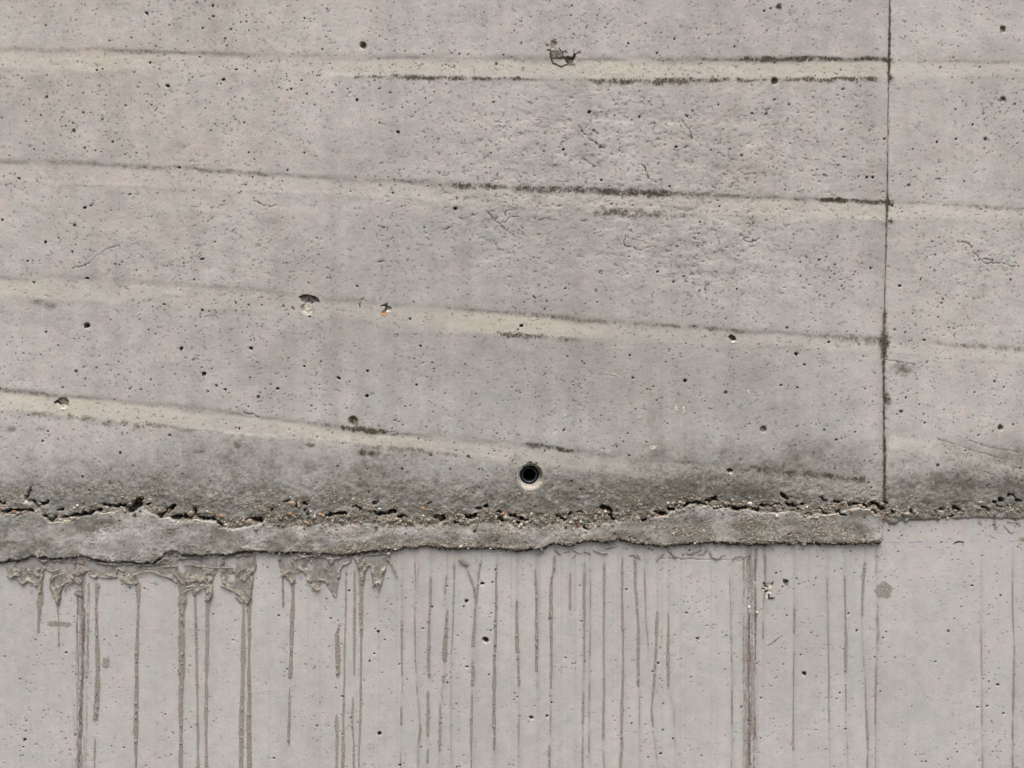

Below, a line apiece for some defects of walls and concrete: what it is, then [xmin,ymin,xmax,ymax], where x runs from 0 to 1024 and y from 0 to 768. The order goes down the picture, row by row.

spalling [550,40,581,68]